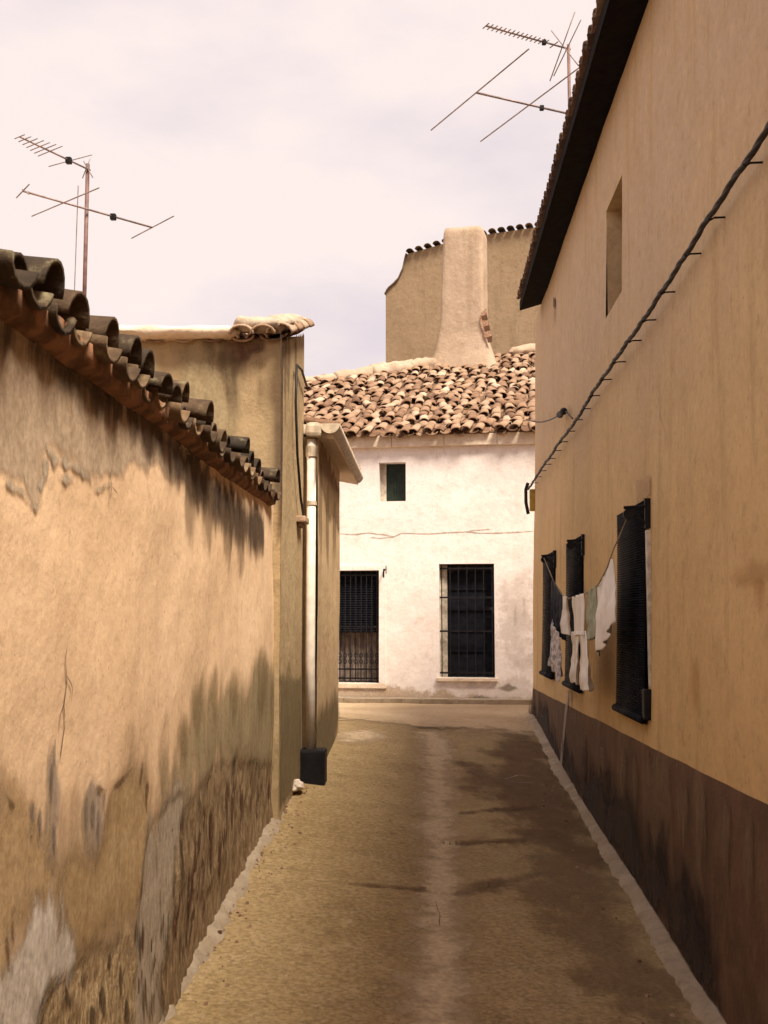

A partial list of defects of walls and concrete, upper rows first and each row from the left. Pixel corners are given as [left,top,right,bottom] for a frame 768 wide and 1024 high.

flaking render [0,319,191,511]
crack [59,645,73,758]
damp [0,743,139,1024]
flaking render [0,749,273,1024]
damp [154,662,301,970]
damp [442,689,715,1023]